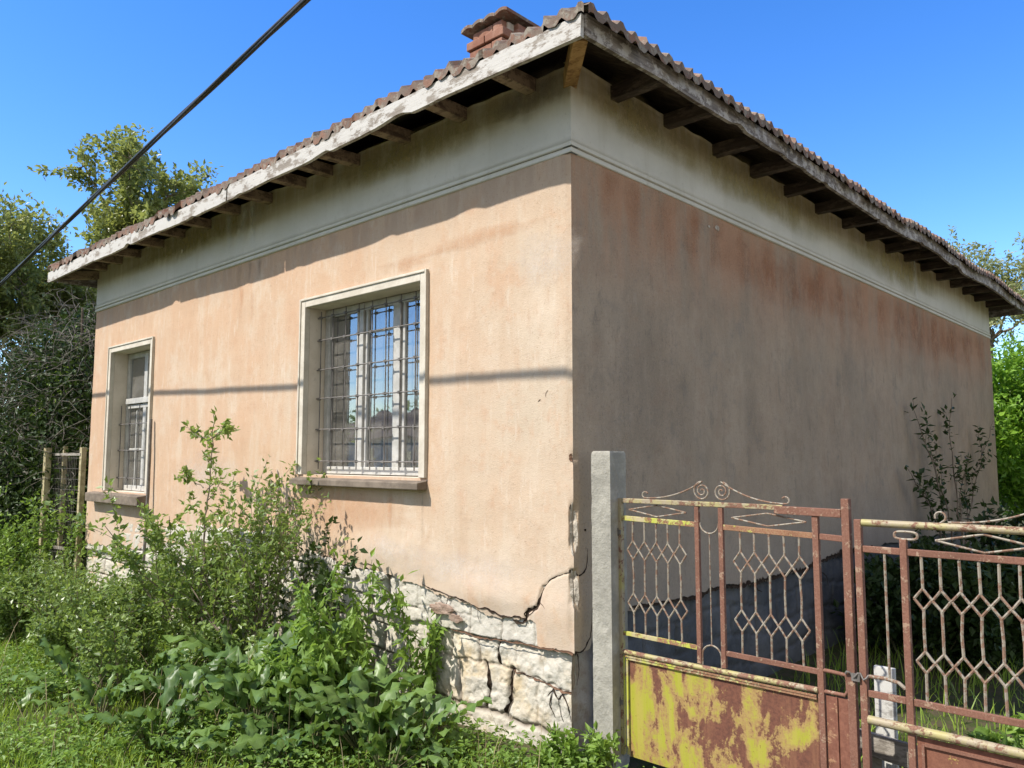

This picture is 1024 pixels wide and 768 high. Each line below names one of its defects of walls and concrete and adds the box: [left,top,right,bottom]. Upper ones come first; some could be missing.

spalling [429,602,463,624]
crack [422,529,593,720]